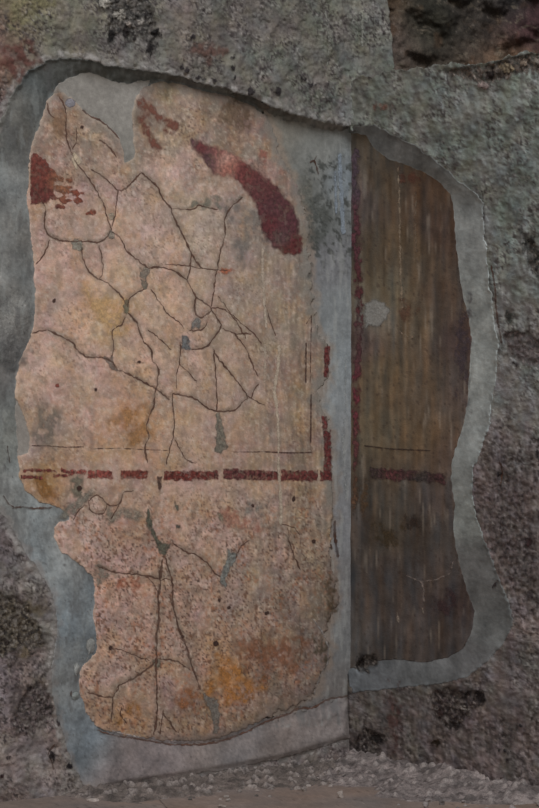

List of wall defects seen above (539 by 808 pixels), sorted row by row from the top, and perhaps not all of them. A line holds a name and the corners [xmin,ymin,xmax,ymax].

spalling [444,54,539,89]
spalling [519,227,539,278]
crack [32,96,276,465]
spalling [504,310,539,370]
crack [73,490,134,520]
crack [282,524,300,569]
spalling [486,470,538,615]
spalling [0,592,45,658]
crack [70,543,348,746]
spalling [10,685,60,739]
spalling [431,688,486,730]
spalling [354,726,386,754]